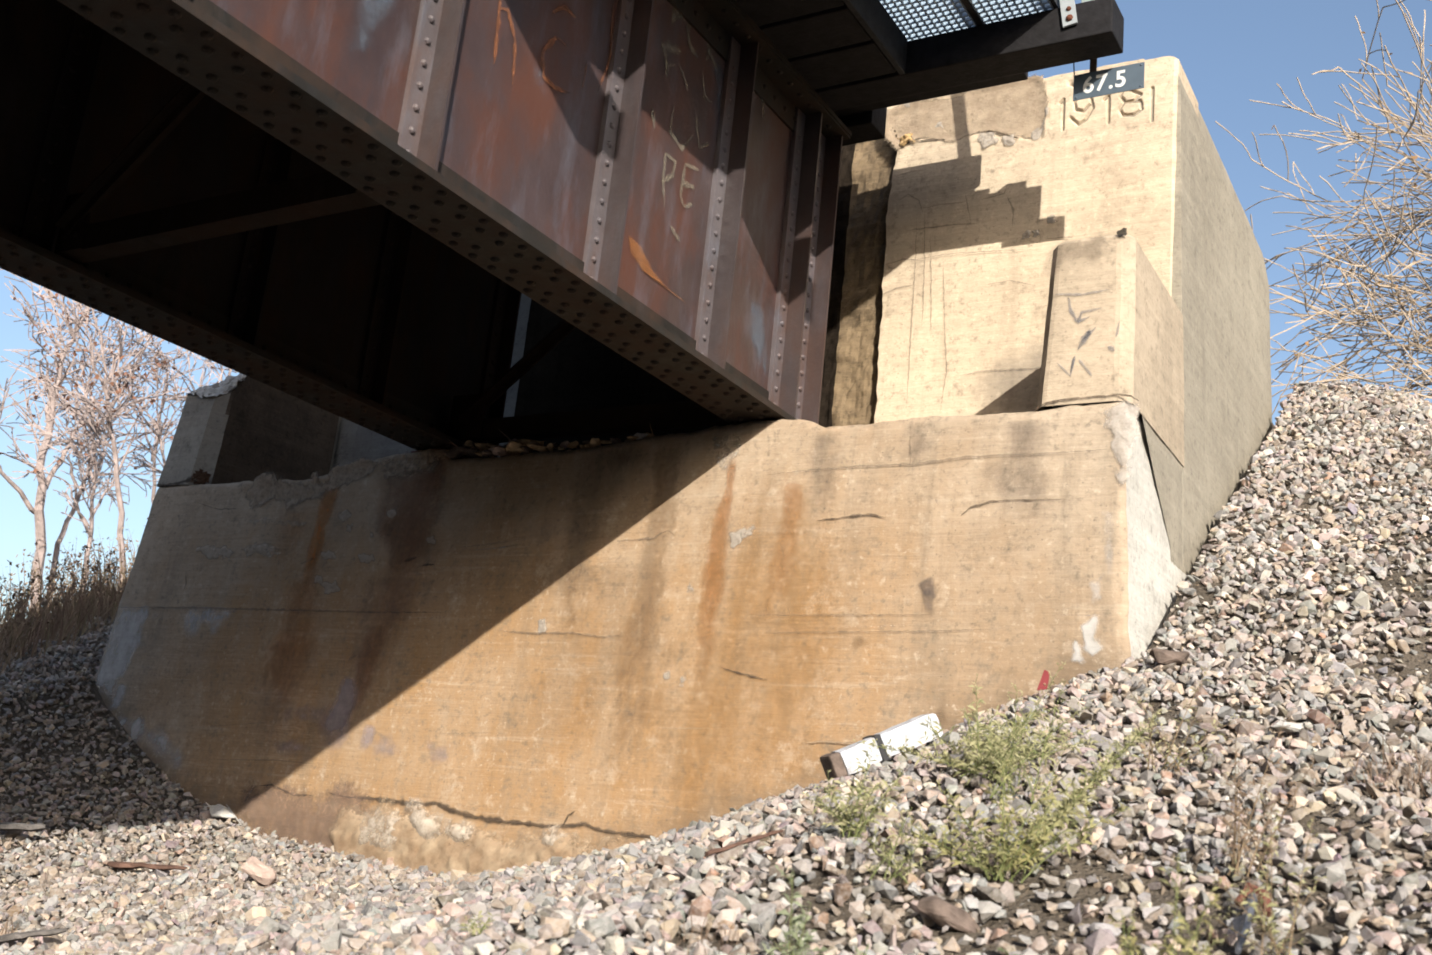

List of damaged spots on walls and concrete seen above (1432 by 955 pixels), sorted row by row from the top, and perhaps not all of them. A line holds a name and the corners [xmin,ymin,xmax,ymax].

crack [894,130,1018,144]
crack [962,499,1060,515]
crack [817,513,886,521]
crack [244,784,657,838]